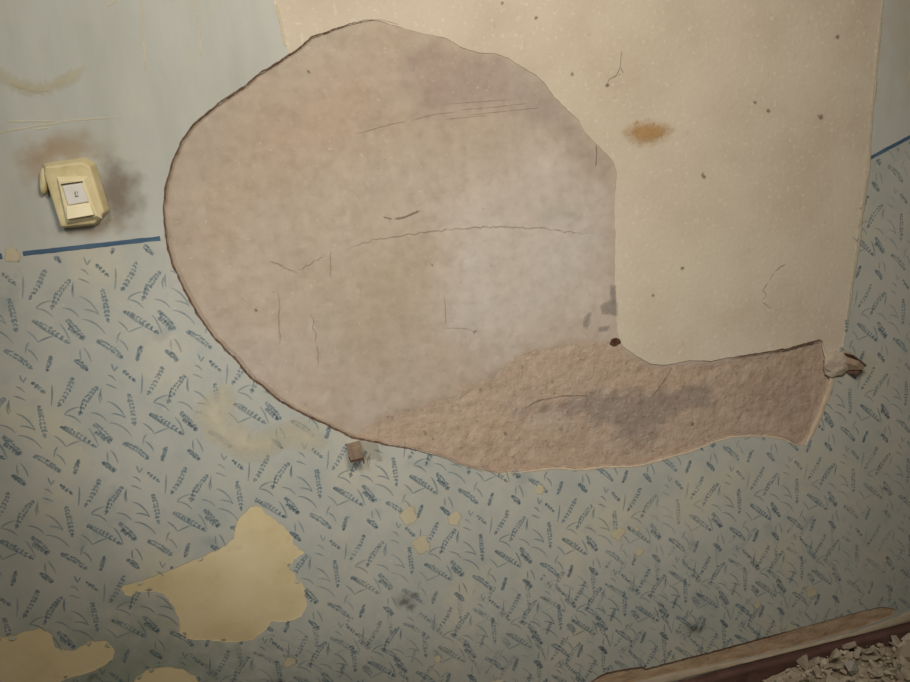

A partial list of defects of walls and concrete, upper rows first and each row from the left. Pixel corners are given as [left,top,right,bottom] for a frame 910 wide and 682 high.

flaking render [163,0,883,475]
peeling [120,506,307,642]
peeling [0,628,115,682]
peeling [134,666,199,682]
flaking render [591,607,895,682]